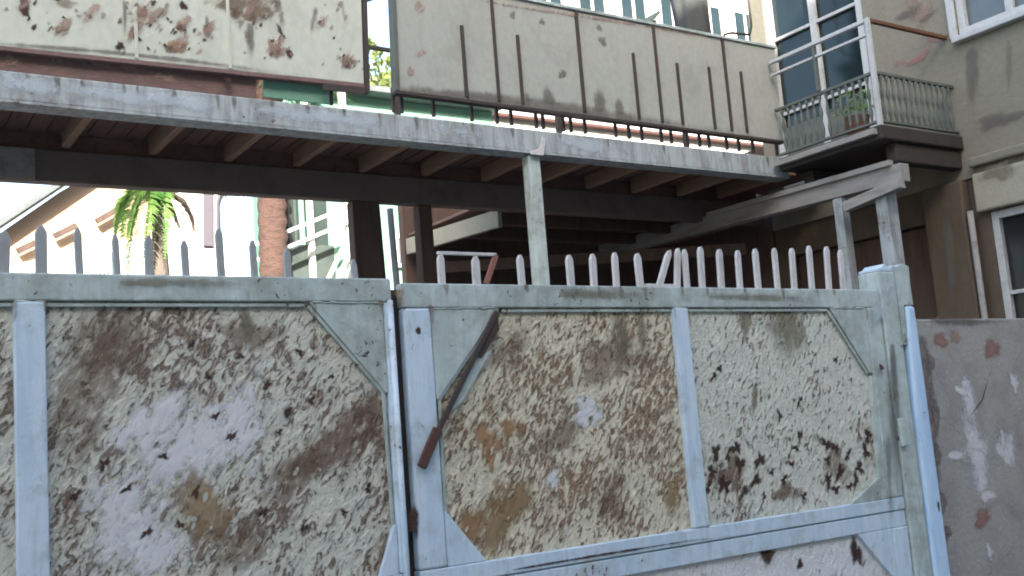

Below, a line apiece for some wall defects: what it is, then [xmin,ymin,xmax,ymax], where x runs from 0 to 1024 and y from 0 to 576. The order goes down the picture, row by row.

spalling [937,494,952,540]
peeling [920,331,1015,528]